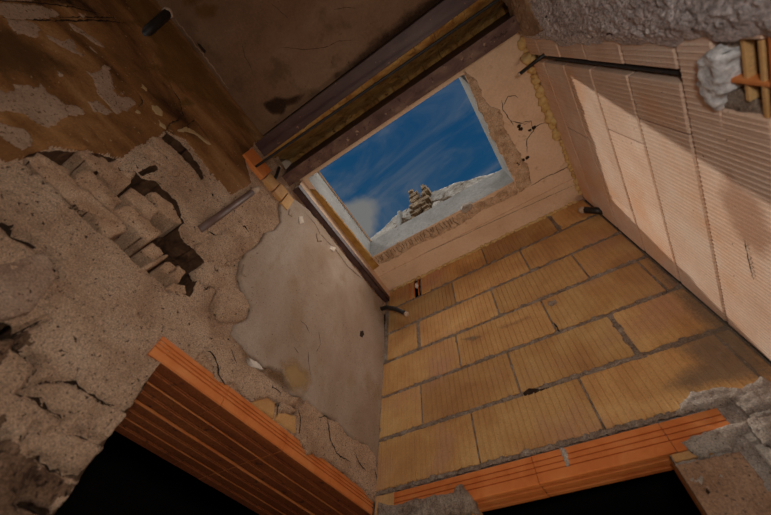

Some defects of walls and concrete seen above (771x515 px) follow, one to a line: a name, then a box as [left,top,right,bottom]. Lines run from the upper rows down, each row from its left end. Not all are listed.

peeling [0,0,105,56]
crack [0,0,126,24]
peeling [0,65,141,128]
spalling [139,105,196,179]
leakage [265,96,300,114]
spalling [373,71,532,264]
crack [502,95,543,146]
spalling [0,123,186,295]
crack [432,167,568,250]
flaking render [0,252,56,321]
peeling [230,200,385,461]